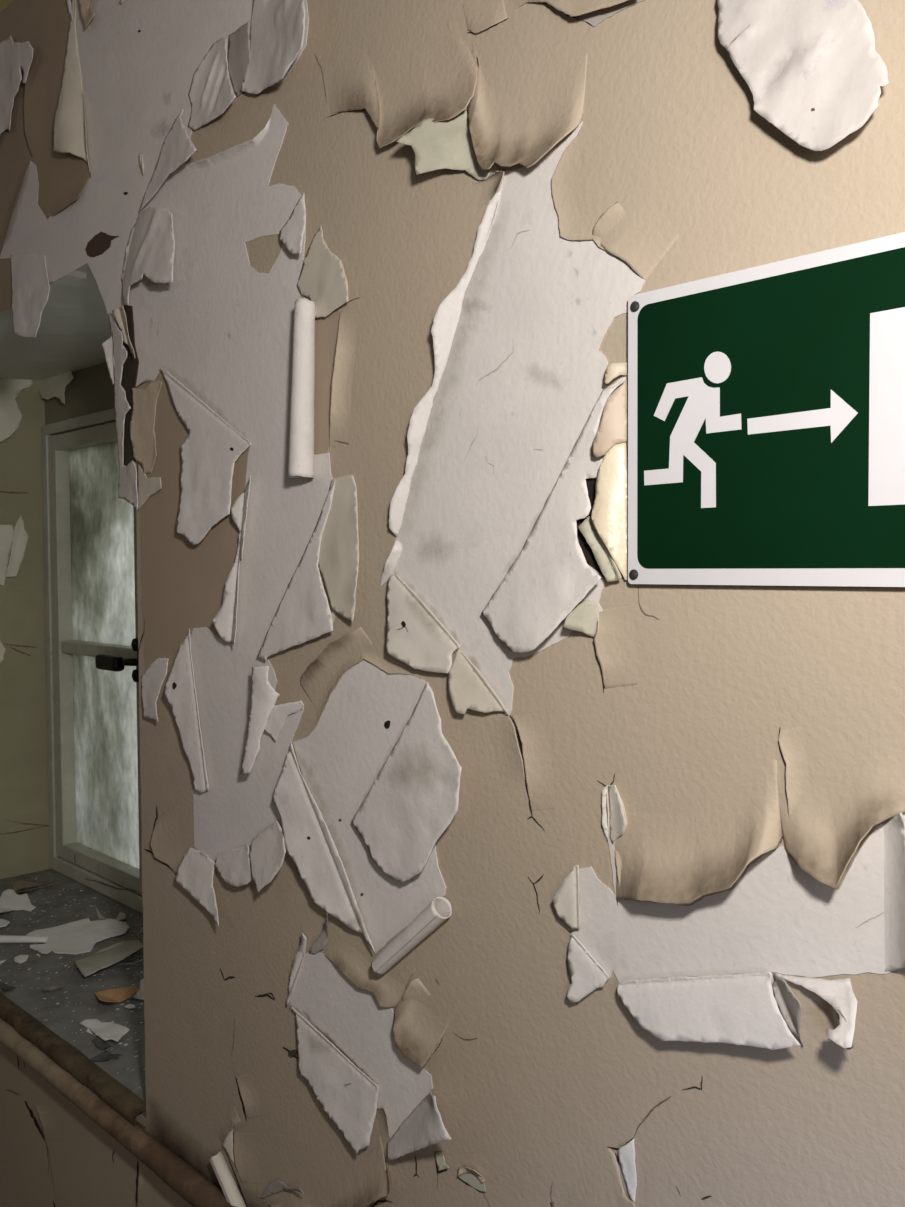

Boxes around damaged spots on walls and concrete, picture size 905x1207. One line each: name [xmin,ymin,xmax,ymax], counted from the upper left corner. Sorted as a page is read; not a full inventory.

peeling [717,0,889,151]
peeling [0,0,679,1207]
crack [482,713,555,831]
peeling [552,730,905,1050]
crack [5,1056,60,1207]